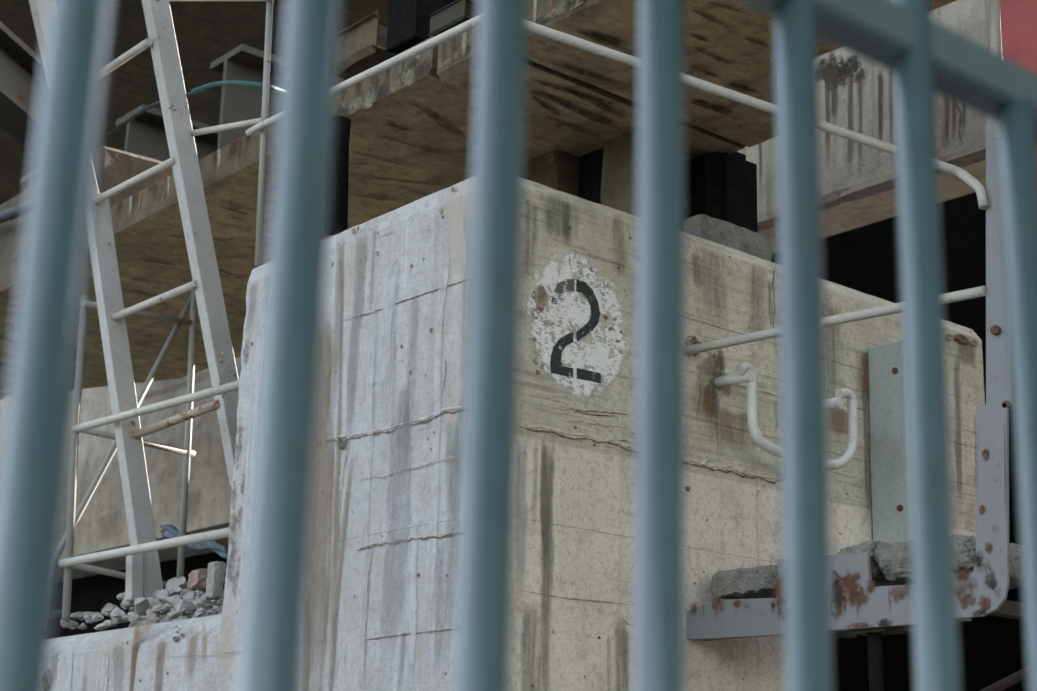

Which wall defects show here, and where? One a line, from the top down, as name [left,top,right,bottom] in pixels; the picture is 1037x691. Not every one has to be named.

leakage [825,68,893,139]
spalling [530,284,547,319]
crack [519,395,635,452]
crack [685,381,781,484]
crack [326,354,463,690]
leakage [517,450,554,691]
rust [831,570,889,629]
rust [956,544,997,616]
rust [129,612,155,691]
rust [155,643,164,691]